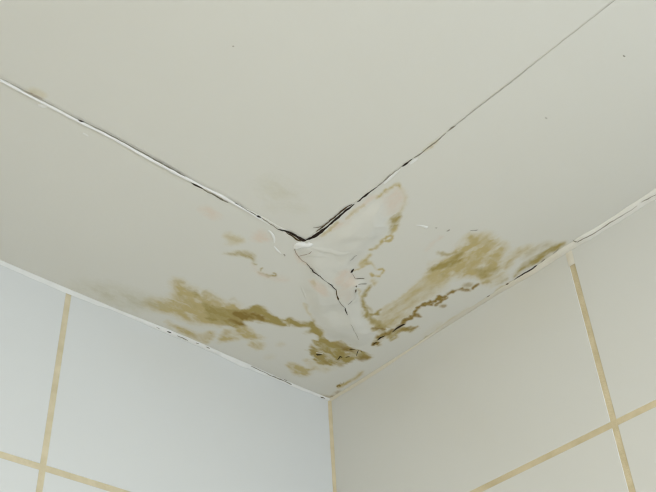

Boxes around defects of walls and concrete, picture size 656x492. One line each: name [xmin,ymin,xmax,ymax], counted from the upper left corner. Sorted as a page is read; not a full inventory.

crack [0,0,615,360]
leakage [61,181,571,398]